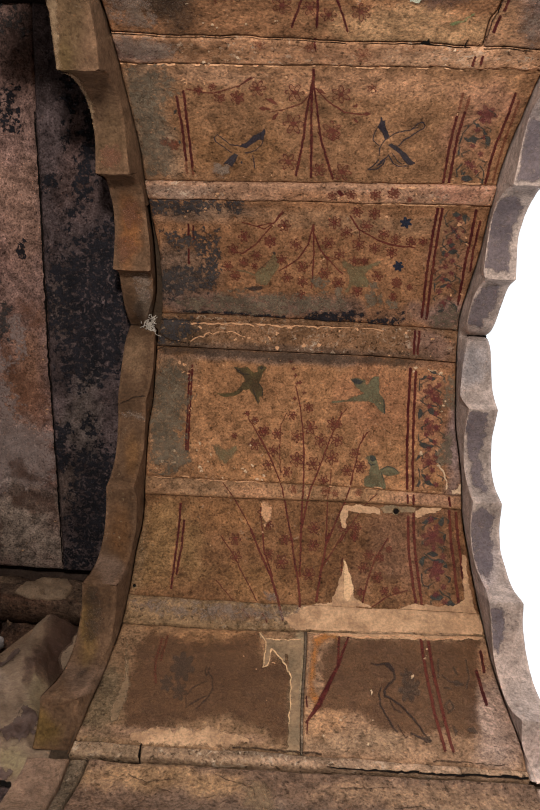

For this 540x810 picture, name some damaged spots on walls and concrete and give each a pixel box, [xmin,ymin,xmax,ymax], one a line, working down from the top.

crack [110,32,346,44]
crack [368,0,540,52]
peeling [154,448,265,491]
peeling [256,493,272,533]
peeling [340,504,442,528]
peeling [256,555,483,751]
crack [232,747,529,789]